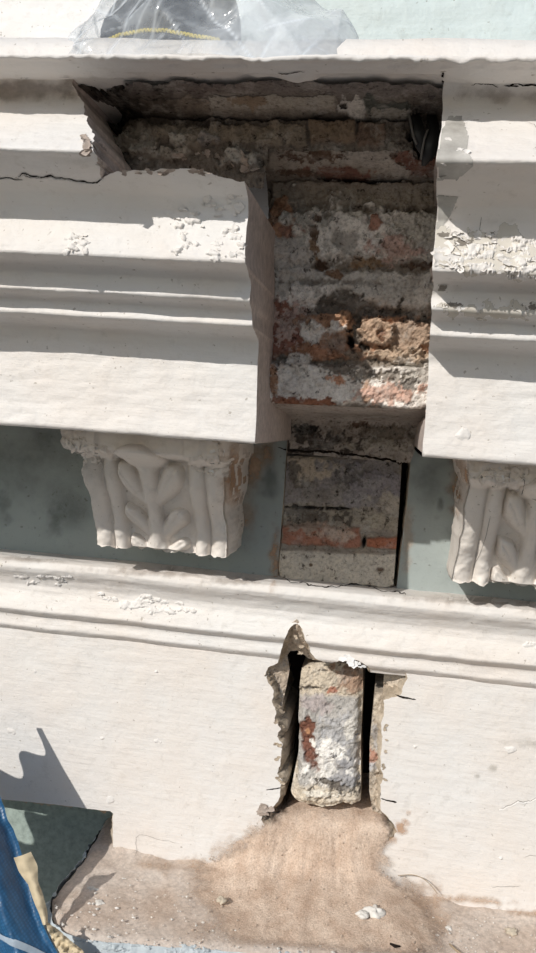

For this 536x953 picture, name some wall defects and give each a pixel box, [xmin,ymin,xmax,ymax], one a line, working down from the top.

spalling [78,79,473,189]
crack [0,173,106,185]
peeling [430,195,536,283]
peeling [61,431,121,466]
peeling [187,449,234,478]
flaking render [264,619,320,728]
spalling [339,654,366,669]
spalling [369,673,404,837]
spalling [256,803,274,817]